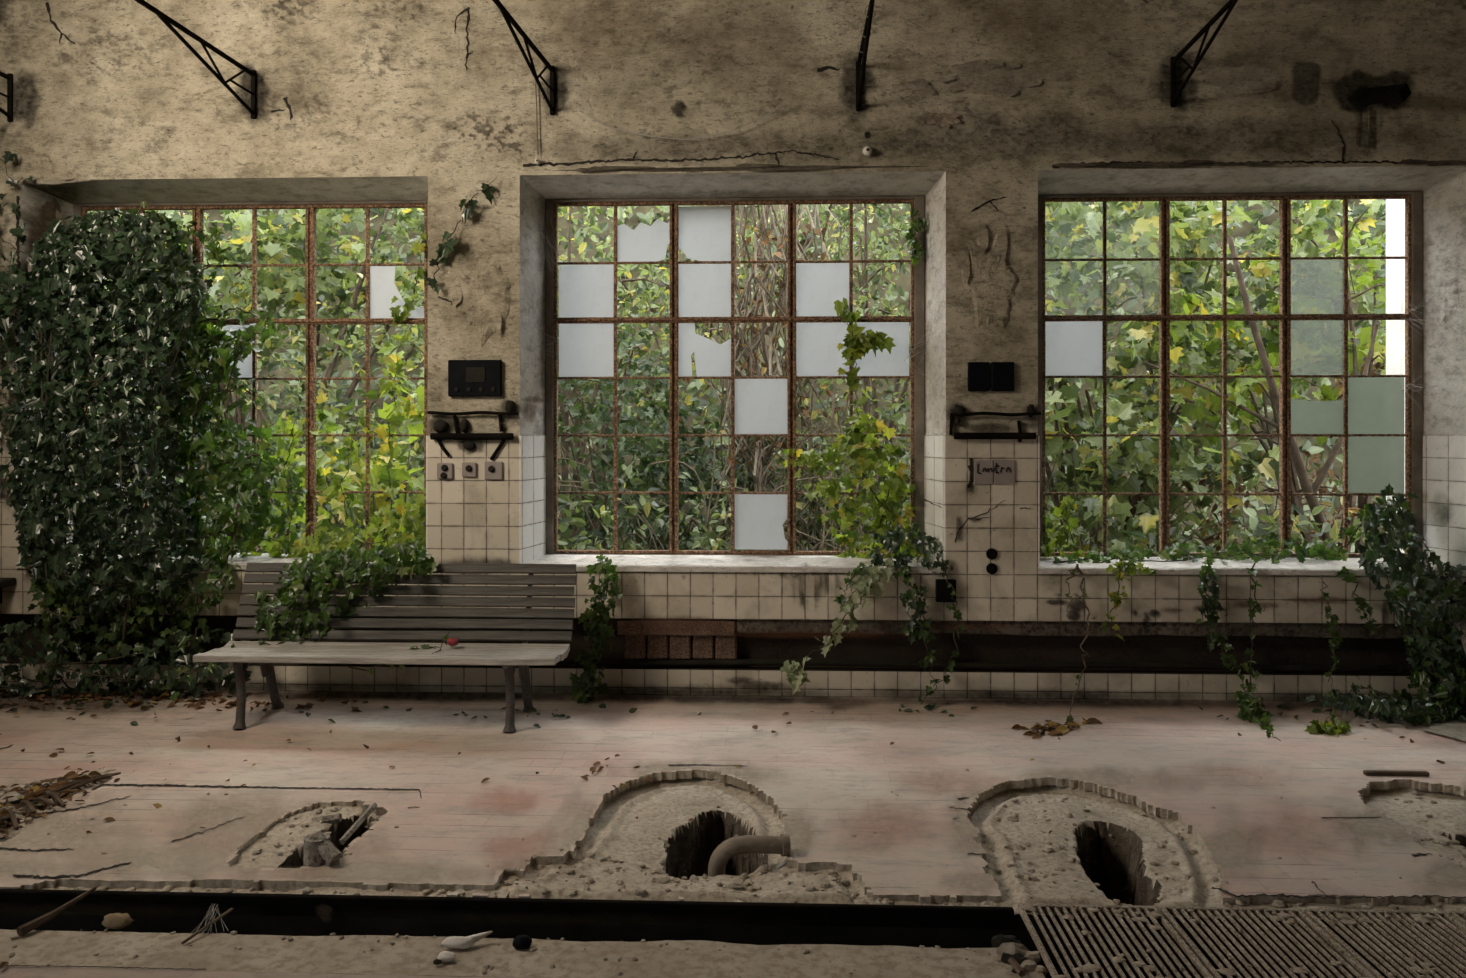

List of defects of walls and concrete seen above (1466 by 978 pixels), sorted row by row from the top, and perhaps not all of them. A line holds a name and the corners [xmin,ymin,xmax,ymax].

leakage [1293,62,1412,147]
spalling [0,768,121,842]
spalling [232,803,382,869]
spalling [476,777,876,904]
spalling [971,785,1234,918]
spalling [1362,787,1466,868]